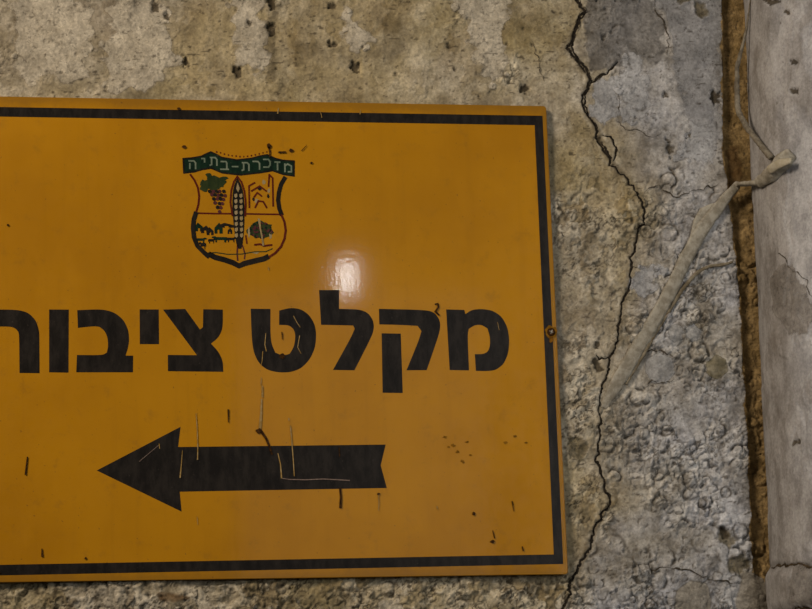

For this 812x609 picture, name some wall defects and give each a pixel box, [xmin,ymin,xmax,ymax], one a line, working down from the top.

crack [561,0,719,609]
crack [646,566,733,584]
crack [771,562,812,570]